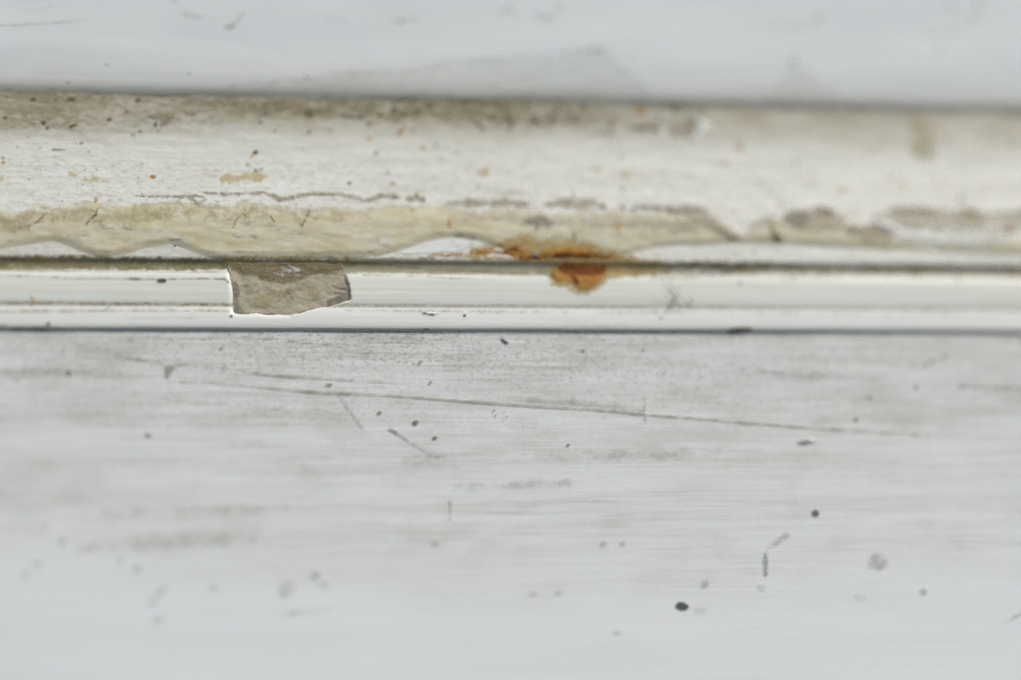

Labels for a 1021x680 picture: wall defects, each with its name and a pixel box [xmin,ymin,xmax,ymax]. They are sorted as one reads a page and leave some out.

peeling [136,191,425,204]
peeling [447,191,529,210]
peeling [544,197,742,240]
peeling [749,205,1021,241]
spalling [225,255,351,315]
corrosion [428,234,663,294]